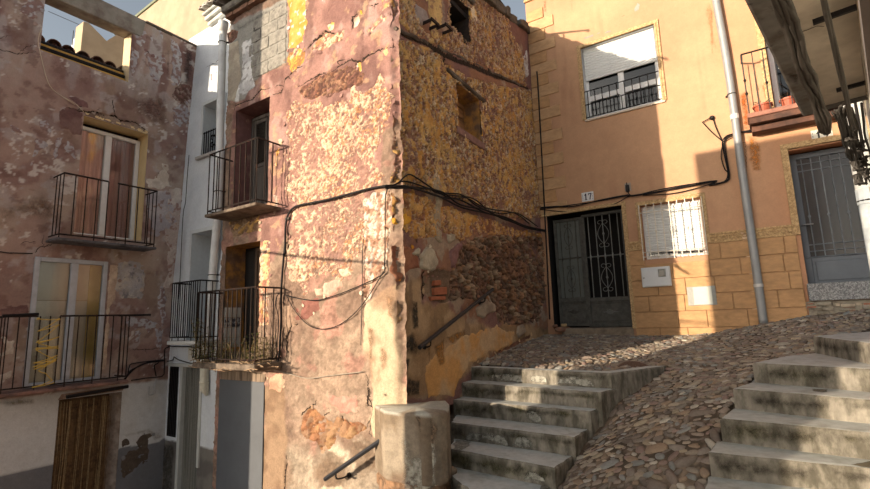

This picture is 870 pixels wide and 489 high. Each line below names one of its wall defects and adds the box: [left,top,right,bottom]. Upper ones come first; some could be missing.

peeling [130,31,192,127]
peeling [227,27,255,97]
peeling [30,97,88,166]
spalling [273,0,546,398]
spalling [229,215,272,326]
peeling [267,372,285,392]
spalling [119,433,155,482]
spalling [301,395,367,454]